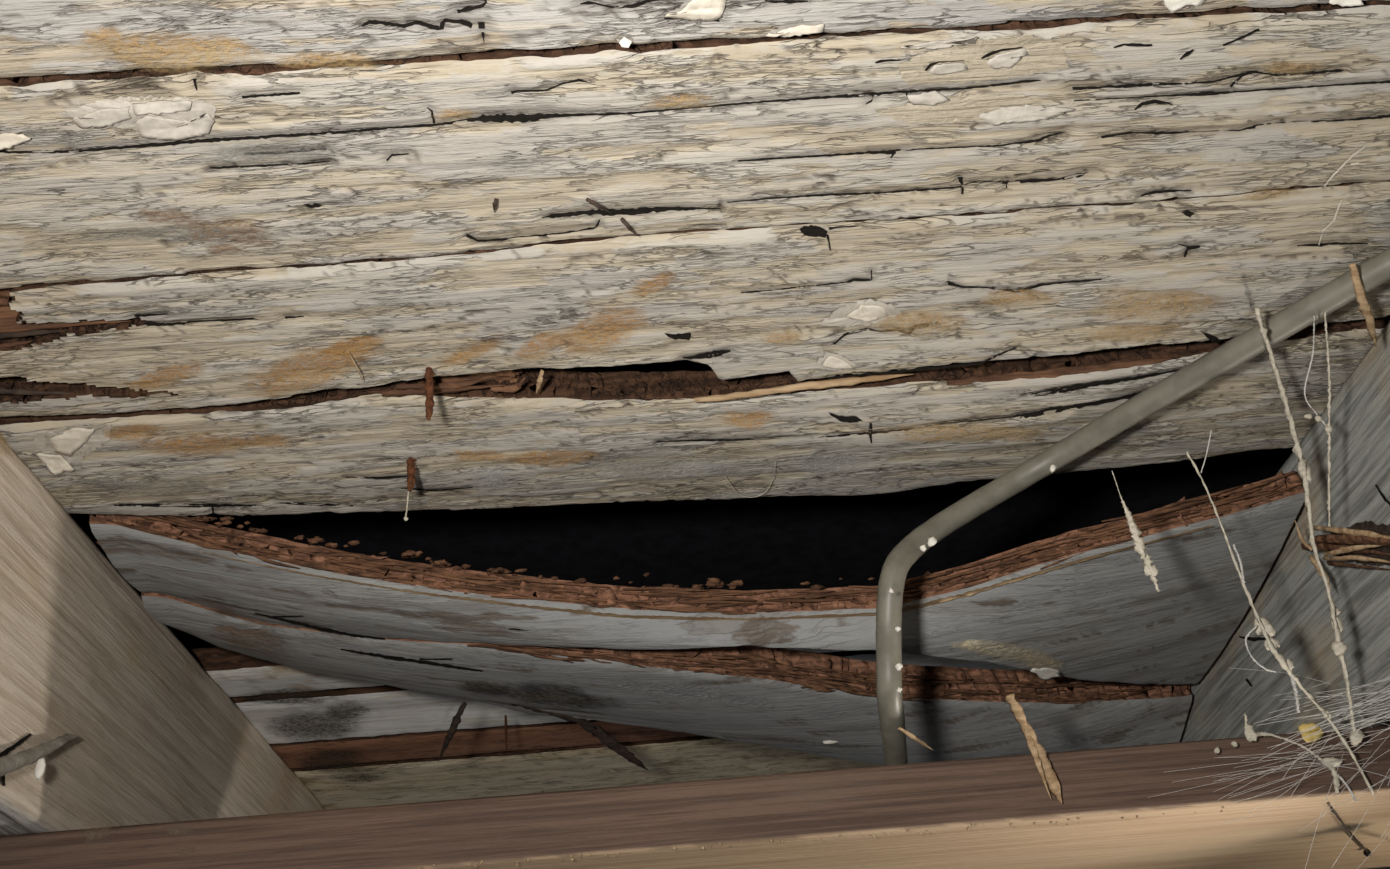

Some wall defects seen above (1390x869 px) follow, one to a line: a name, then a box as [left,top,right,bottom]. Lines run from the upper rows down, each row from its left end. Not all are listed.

peeling [1162,0,1204,13]
peeling [67,95,216,141]
peeling [0,133,31,150]
crack [0,28,1390,242]
crack [1178,244,1200,257]
crack [1297,240,1368,248]
crack [741,270,872,293]
crack [134,313,304,326]
crack [683,350,731,359]
crack [828,324,1017,379]
peeling [33,424,112,475]